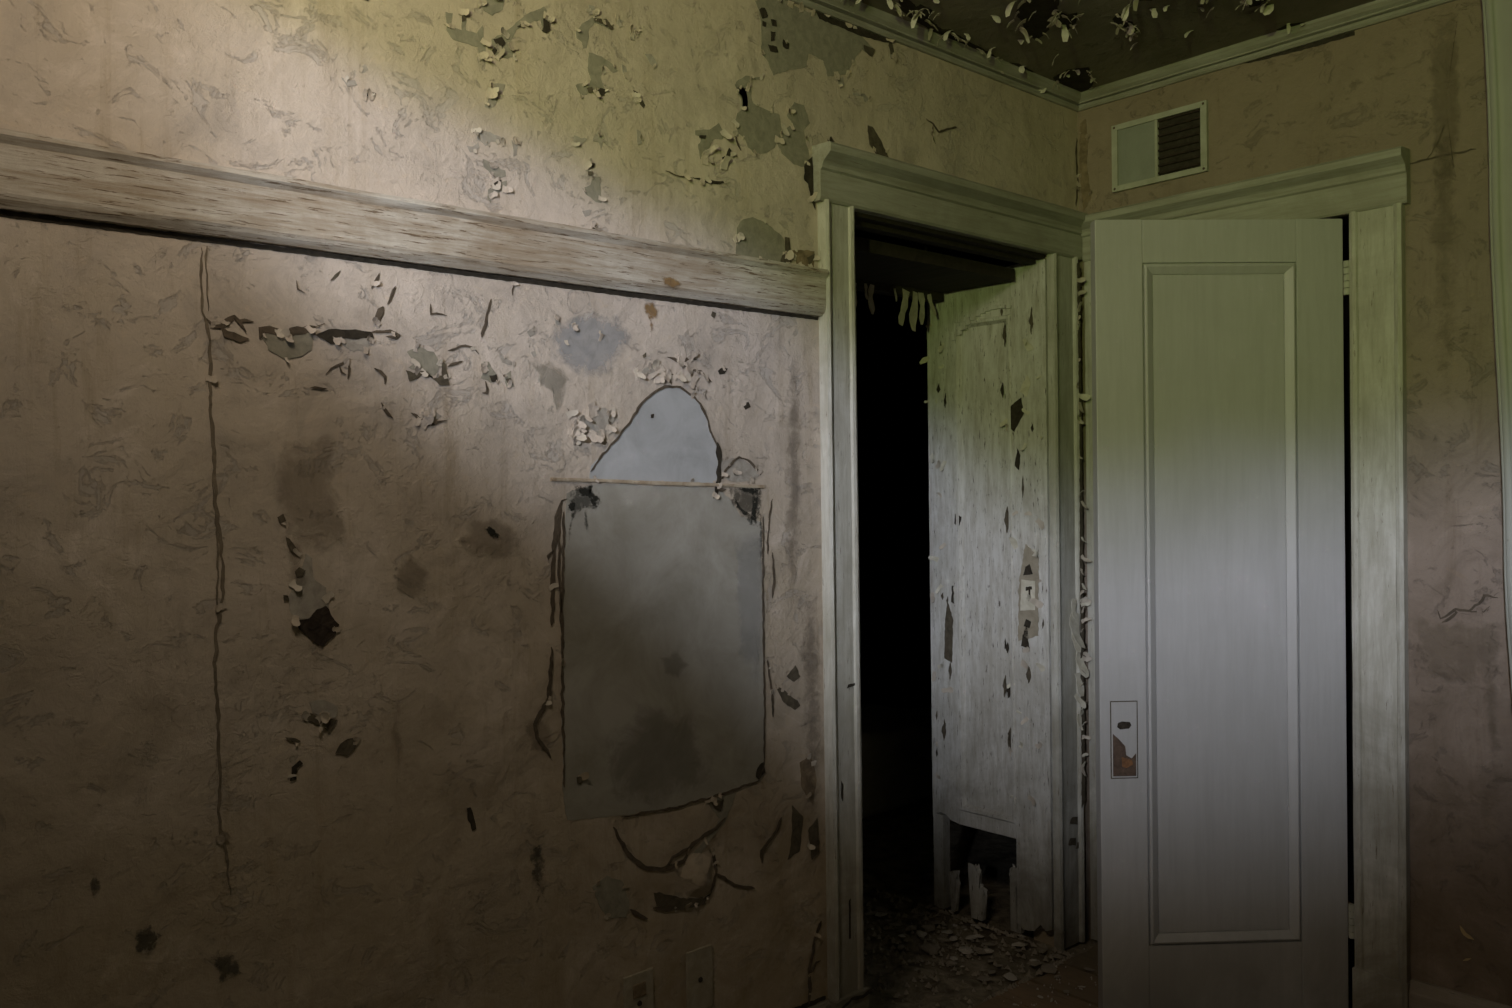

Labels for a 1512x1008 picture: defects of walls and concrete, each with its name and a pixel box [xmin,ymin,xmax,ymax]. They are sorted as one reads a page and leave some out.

peeling [444,0,555,62]
peeling [575,5,645,108]
peeling [683,0,897,210]
peeling [887,0,1033,74]
peeling [990,0,1097,93]
peeling [733,217,820,267]
peeling [406,343,451,385]
crack [430,282,519,367]
crack [199,247,400,895]
flaking render [277,514,341,647]
flaking render [561,351,800,853]
crack [613,499,782,893]